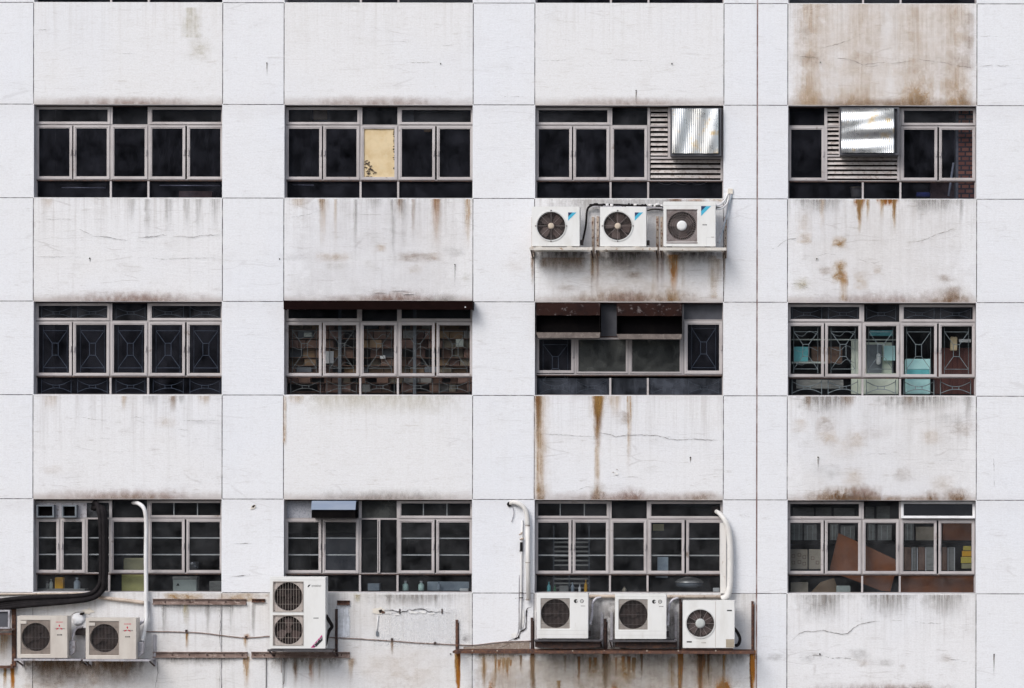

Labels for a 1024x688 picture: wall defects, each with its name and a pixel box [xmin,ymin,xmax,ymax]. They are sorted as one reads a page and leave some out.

rust [855,199,897,221]
rust [657,255,677,279]
rust [594,396,602,428]
leakage [806,396,837,405]
leakage [818,489,890,500]
rust [483,654,535,688]
rust [577,654,643,688]
rust [671,654,683,688]